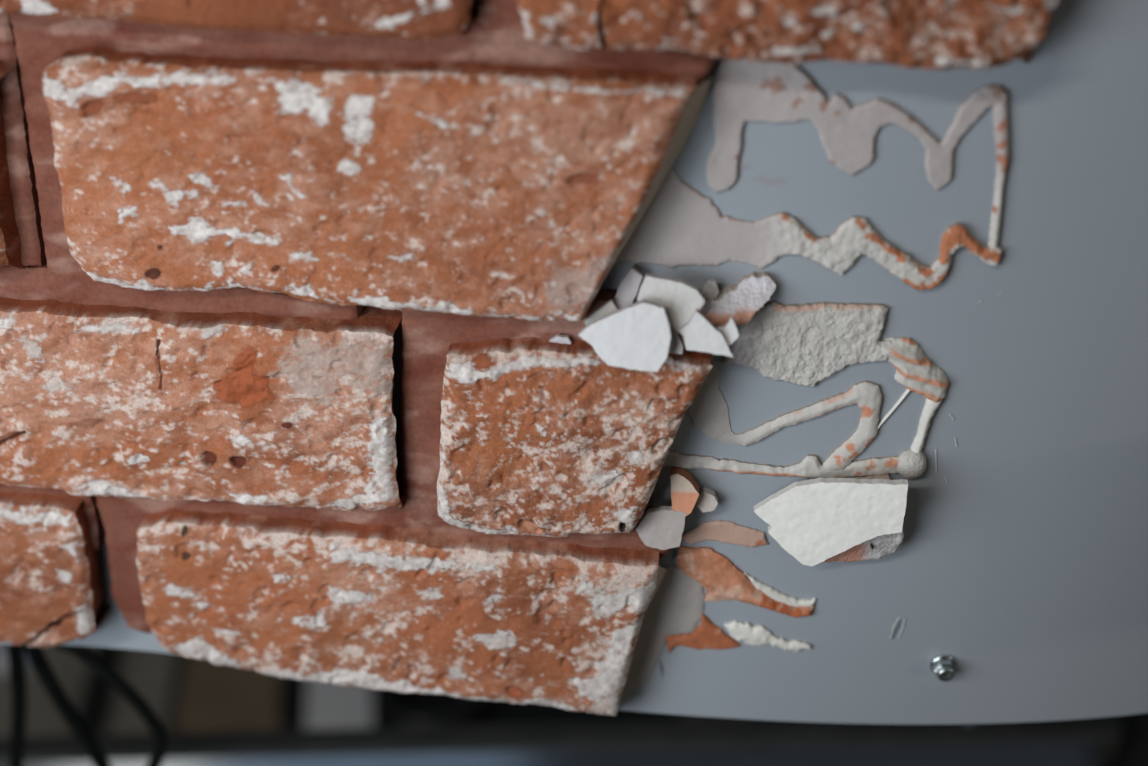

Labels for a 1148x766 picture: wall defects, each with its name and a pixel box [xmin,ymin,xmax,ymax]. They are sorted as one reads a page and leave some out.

crack [596,0,606,49]
peeling [934,56,991,68]
peeling [629,447,643,464]
peeling [592,470,621,487]
peeling [696,487,718,512]
peeling [614,506,638,532]
flaking render [754,473,908,566]